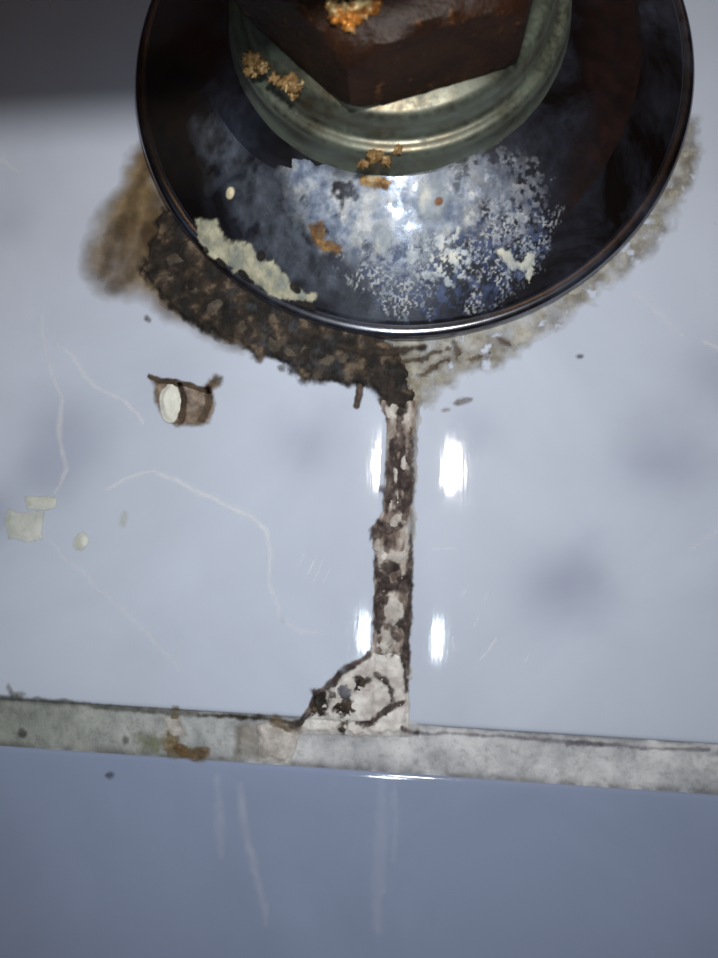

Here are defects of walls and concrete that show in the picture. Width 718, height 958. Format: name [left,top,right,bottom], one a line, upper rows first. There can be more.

water stain [139,209,427,415]
water stain [384,474,414,503]
water stain [370,523,409,607]